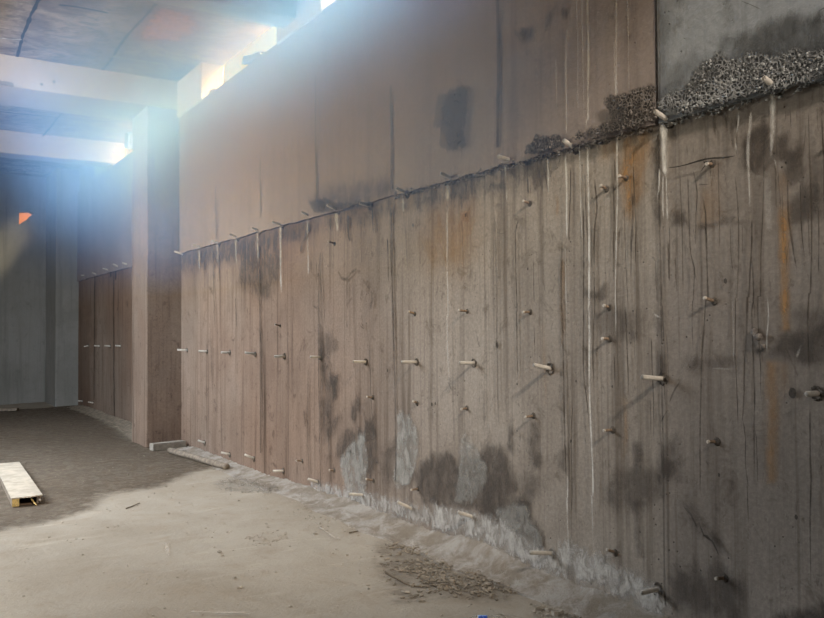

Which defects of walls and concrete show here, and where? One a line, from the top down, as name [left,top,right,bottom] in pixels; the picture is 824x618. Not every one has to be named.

water stain [659,126,707,279]
water stain [416,446,543,548]